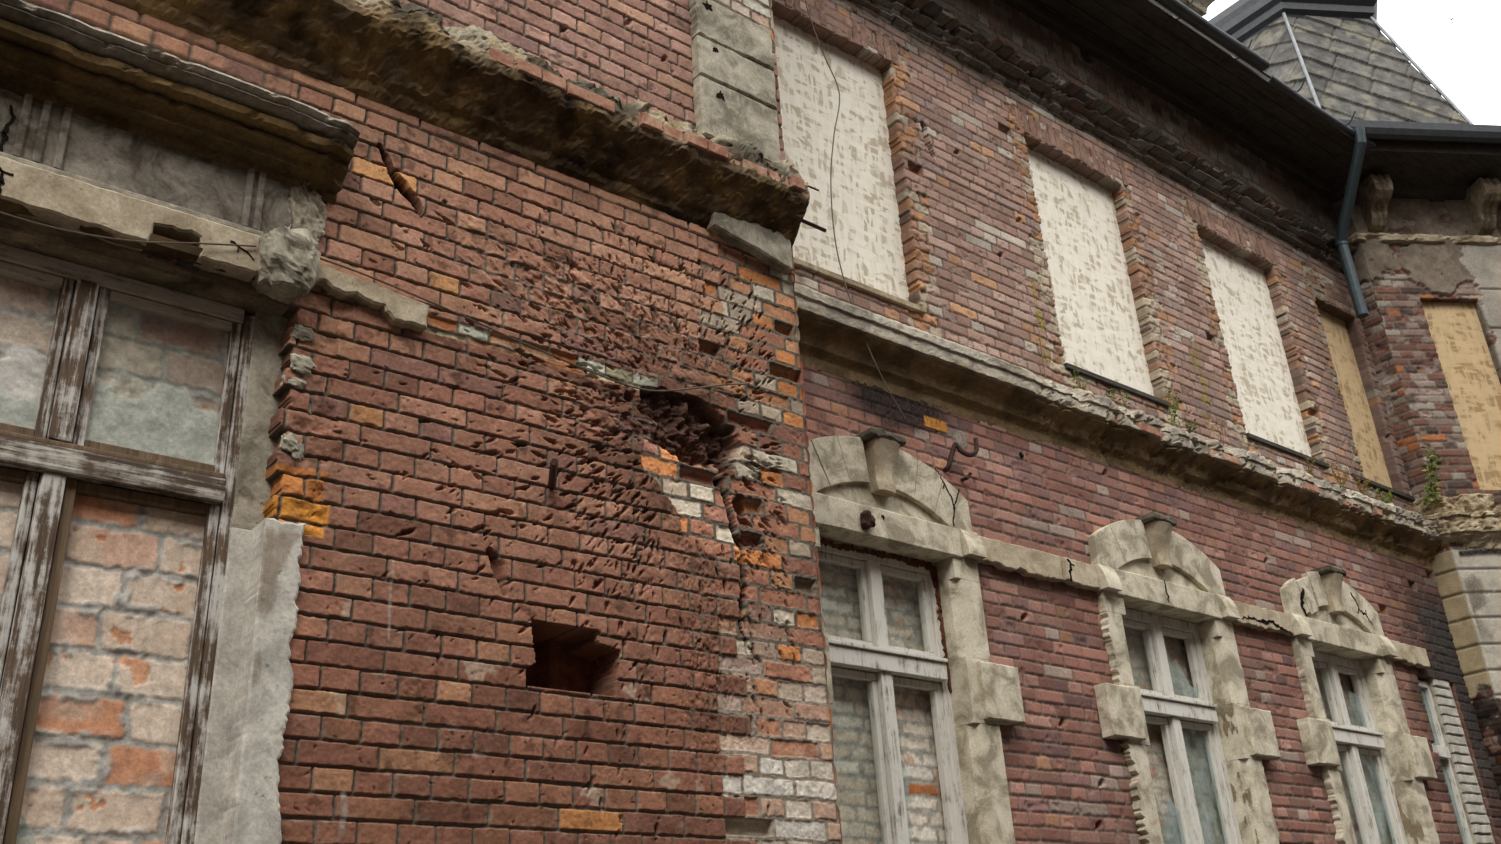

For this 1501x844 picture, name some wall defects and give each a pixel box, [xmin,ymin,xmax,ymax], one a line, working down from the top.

flaking render [489,48,615,114]
flaking render [636,112,805,193]
peeling [285,181,328,243]
flaking render [1115,416,1168,443]
flaking render [1209,449,1241,467]
flaking render [1302,481,1321,495]